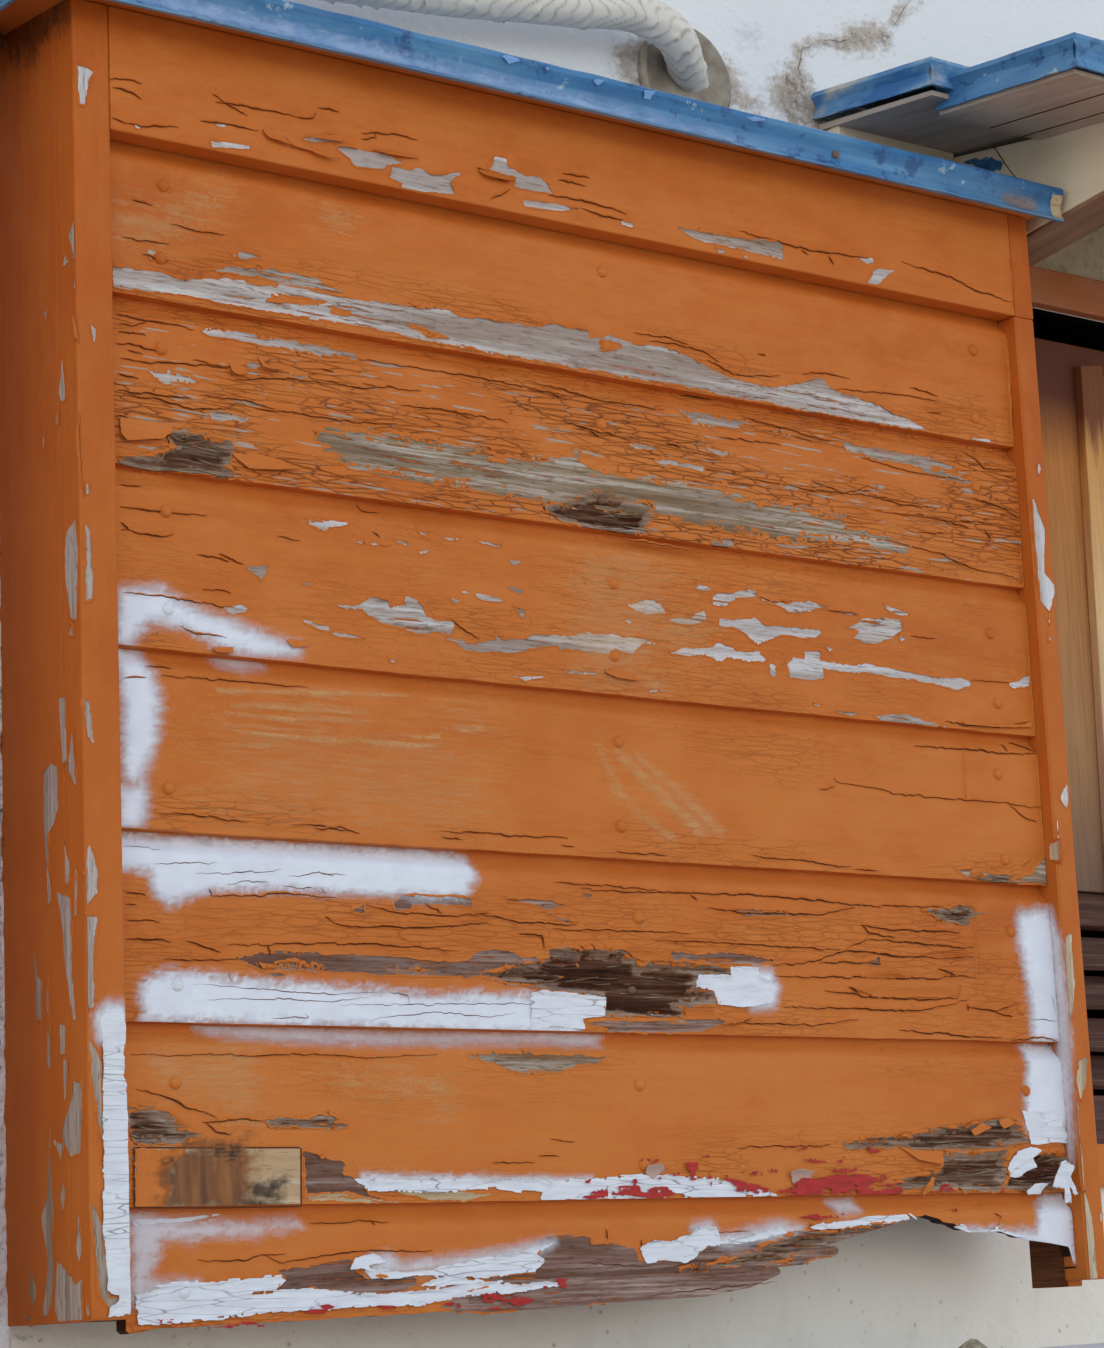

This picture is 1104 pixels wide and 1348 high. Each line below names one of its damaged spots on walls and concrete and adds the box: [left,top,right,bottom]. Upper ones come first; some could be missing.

crack [783,0,922,123]